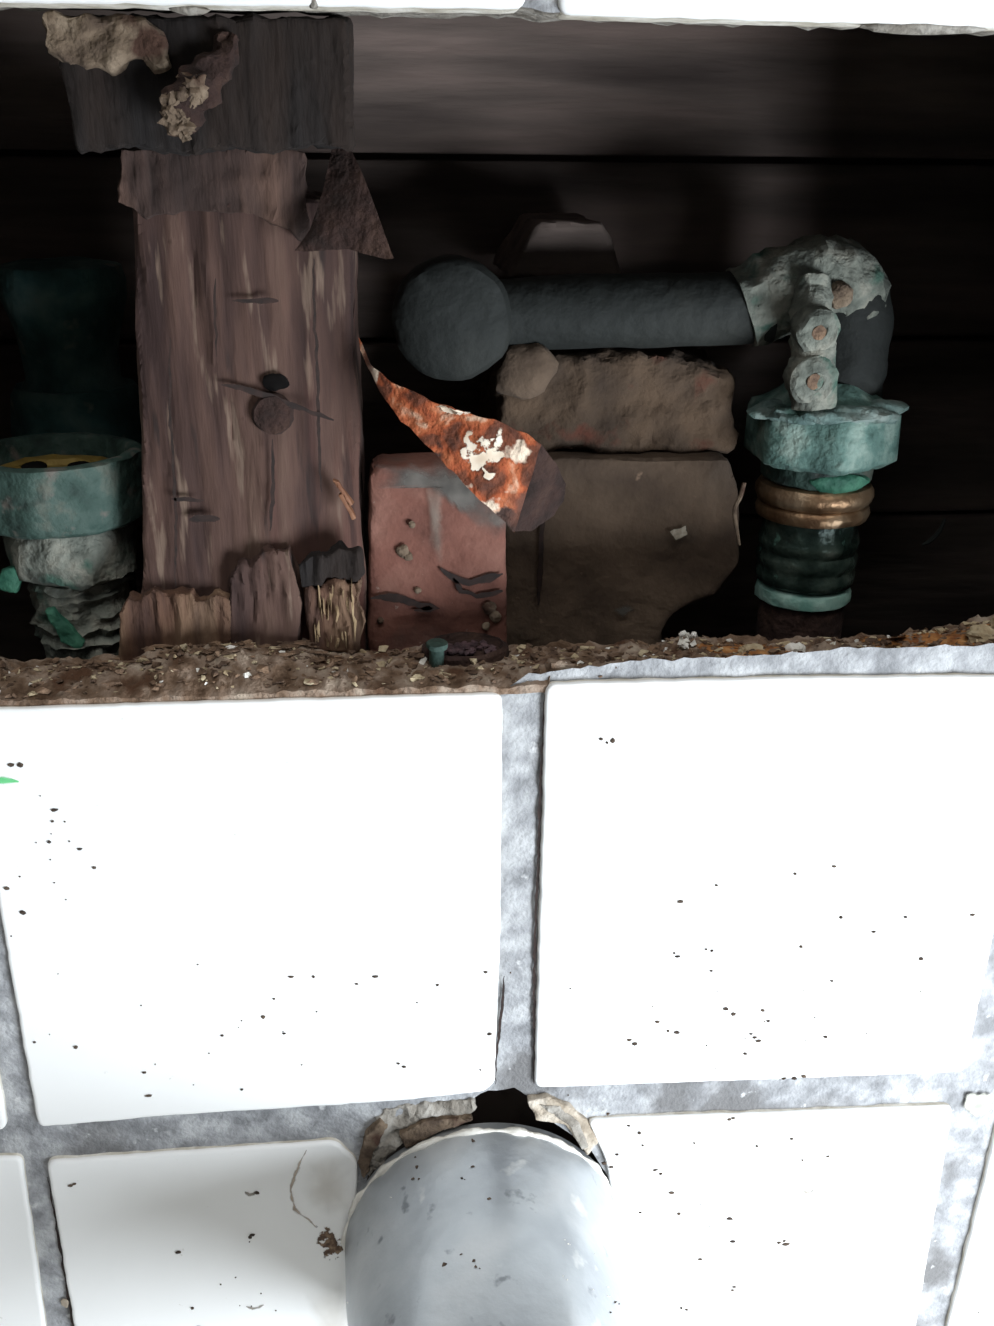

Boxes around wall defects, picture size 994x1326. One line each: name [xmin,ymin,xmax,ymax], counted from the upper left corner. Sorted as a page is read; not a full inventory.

peeling [0,565,22,593]
spalling [0,606,994,706]
peeling [358,1114,473,1179]